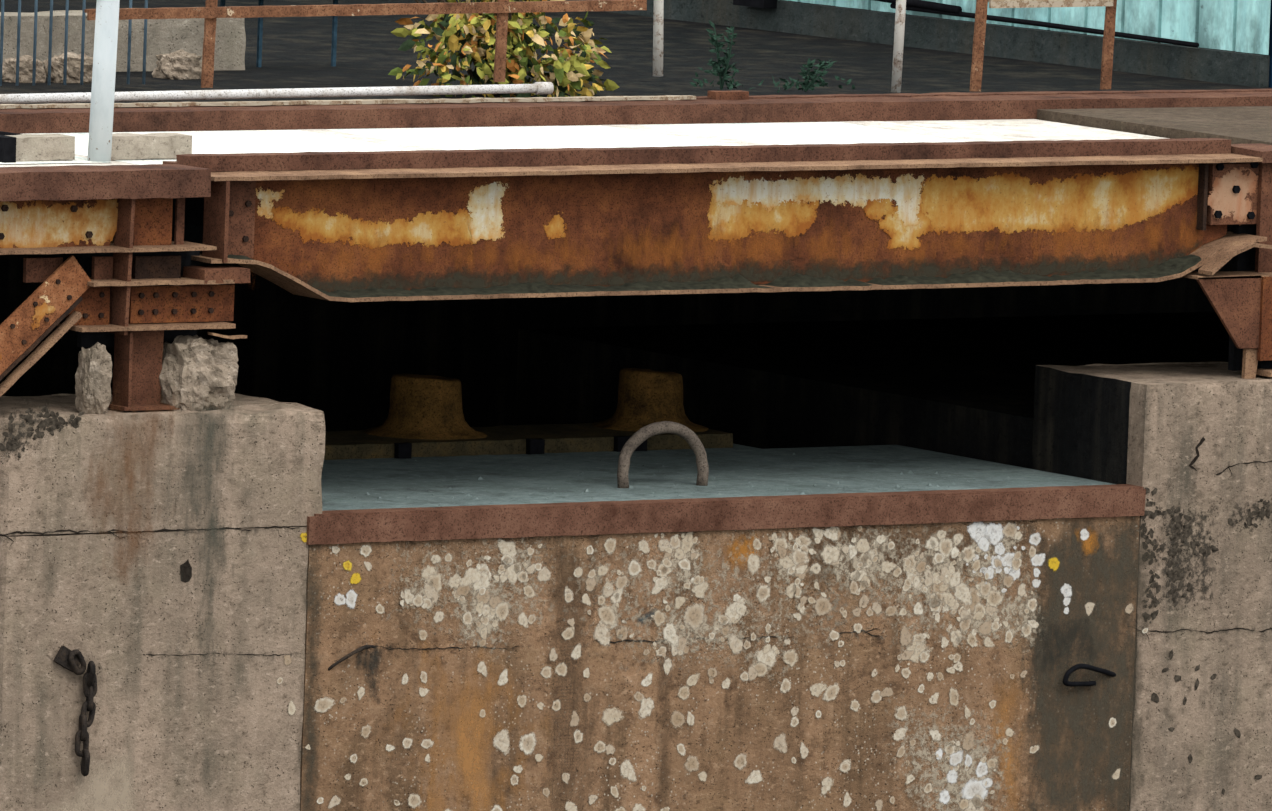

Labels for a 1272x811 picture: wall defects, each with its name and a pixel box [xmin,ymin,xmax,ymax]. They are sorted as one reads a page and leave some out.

peeling [256,182,509,249]
peeling [707,165,1259,251]
crack [1189,437,1272,478]
crack [0,526,306,548]
corrosion [728,536,758,564]
corrosion [1083,534,1095,554]
crack [1128,626,1272,647]